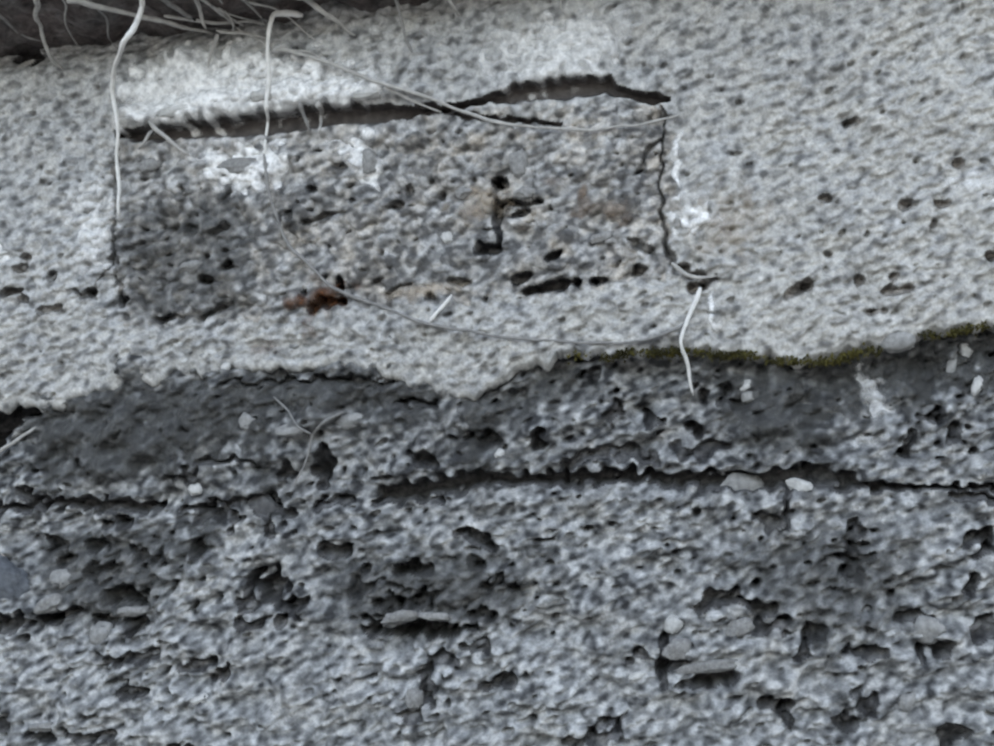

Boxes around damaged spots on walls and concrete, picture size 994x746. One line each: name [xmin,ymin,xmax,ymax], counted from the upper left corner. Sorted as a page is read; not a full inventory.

peeling [500,10,618,83]
spalling [65,37,680,328]
crack [72,73,720,300]
spalling [0,287,63,316]
crack [0,454,256,518]
spalling [311,442,356,513]
spalling [406,450,439,470]
crack [370,442,994,534]
spalling [668,421,731,462]
damp [694,330,994,465]
spalling [897,407,968,458]
spalling [452,527,521,592]